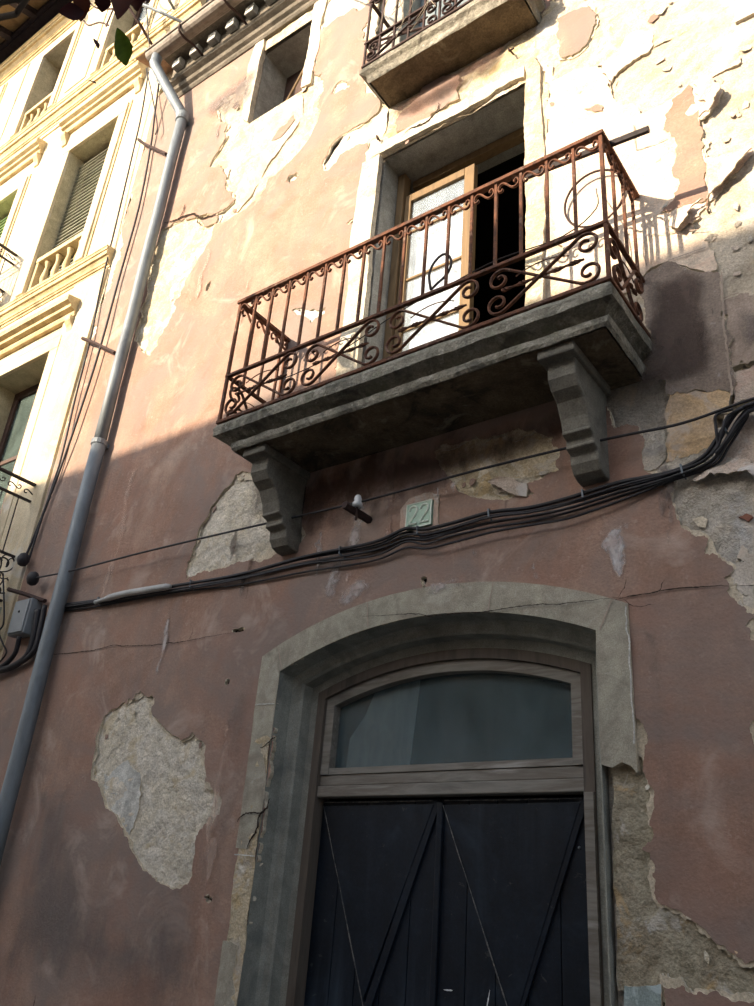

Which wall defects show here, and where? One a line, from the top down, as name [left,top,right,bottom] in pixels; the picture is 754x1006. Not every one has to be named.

flaking render [137,0,368,353]
flaking render [325,0,754,300]
flaking render [625,291,652,341]
flaking render [187,475,271,579]
flaking render [435,433,559,500]
flaking render [653,427,754,564]
crack [381,581,754,617]
flaking render [95,696,222,888]
flaking render [610,756,754,994]